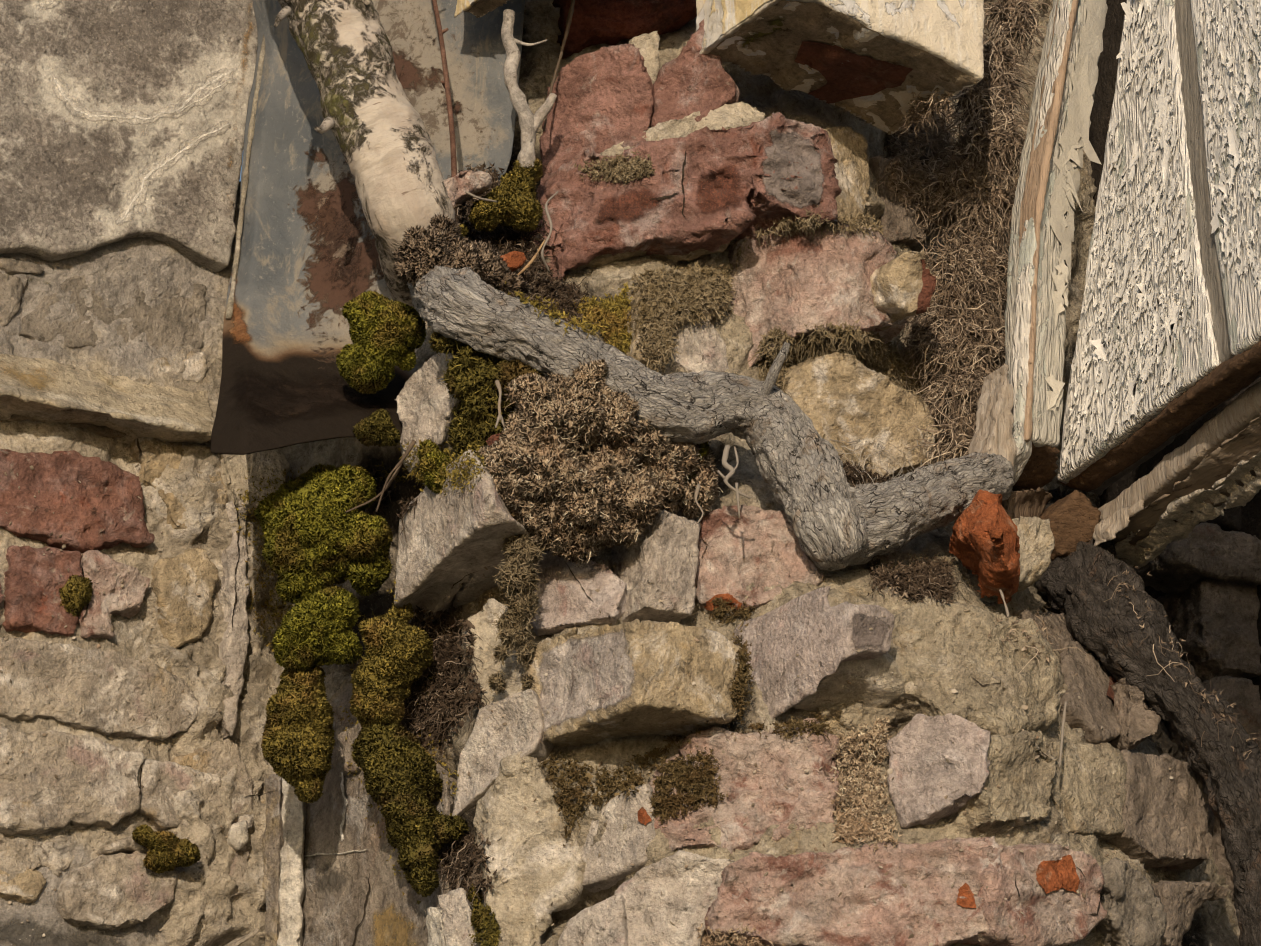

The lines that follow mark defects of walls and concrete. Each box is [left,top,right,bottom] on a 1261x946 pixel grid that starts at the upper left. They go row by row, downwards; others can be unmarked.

crack [52,68,236,225]
peeling [1194,0,1261,295]
corrosion [229,273,252,343]
corrosion [301,179,374,297]
peeling [1046,0,1201,468]